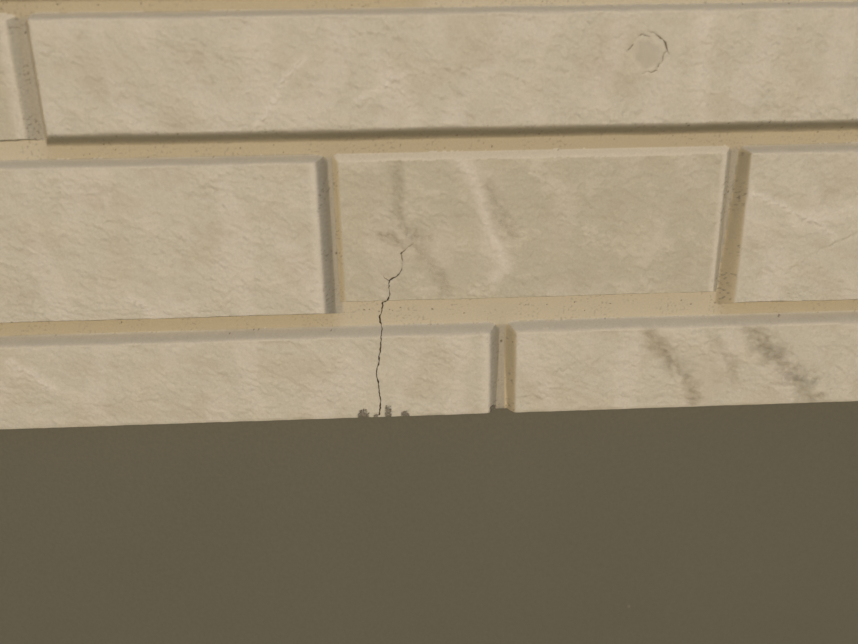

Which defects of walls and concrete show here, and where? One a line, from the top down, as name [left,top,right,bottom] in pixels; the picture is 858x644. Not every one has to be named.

crack [376,248,407,415]